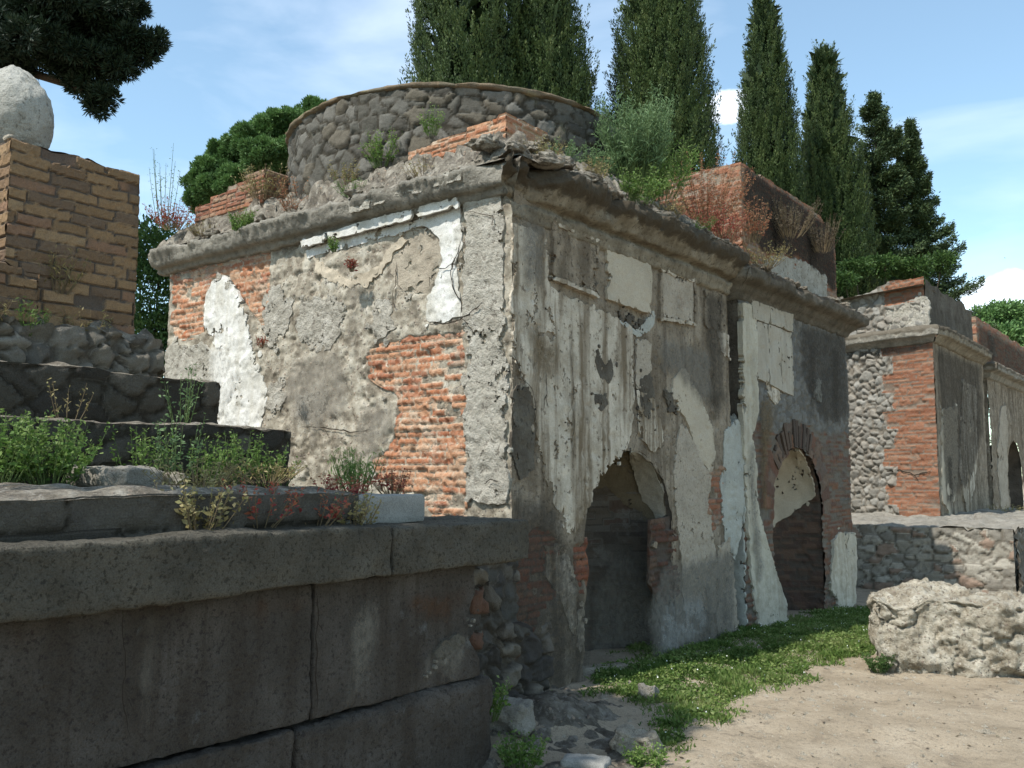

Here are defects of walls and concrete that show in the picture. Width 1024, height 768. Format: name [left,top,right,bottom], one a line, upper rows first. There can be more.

peeling [433,169,463,187]
peeling [163,190,816,653]
peeling [827,527,858,608]